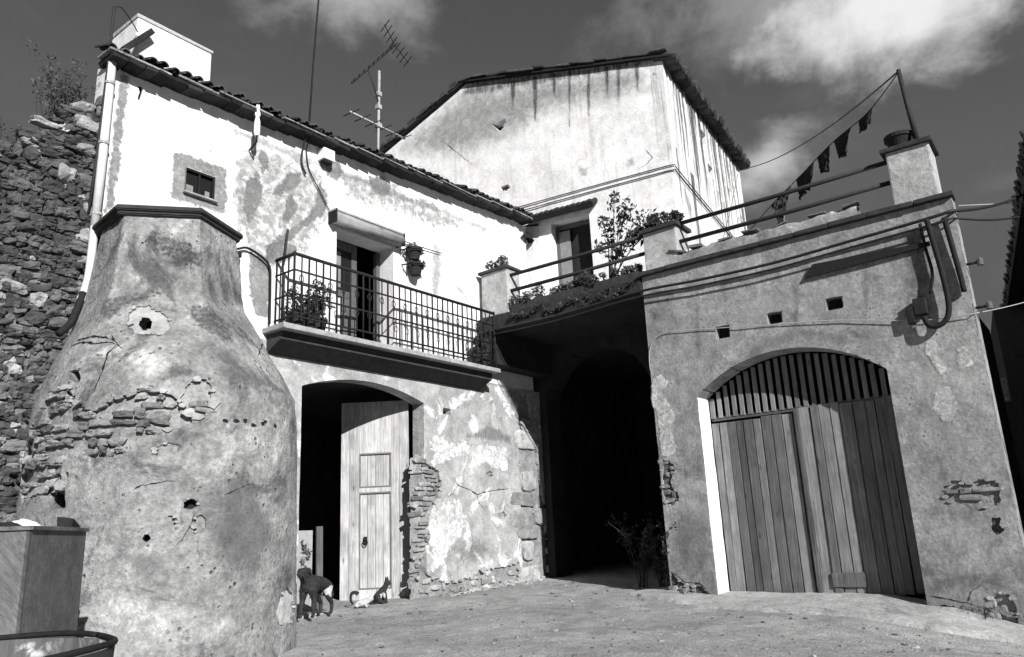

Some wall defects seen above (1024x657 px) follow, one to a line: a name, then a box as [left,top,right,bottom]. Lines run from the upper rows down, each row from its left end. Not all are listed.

water stain [418,62,647,146]
flaking render [127,305,171,335]
crack [72,335,123,391]
flaking render [20,376,277,499]
flaking render [651,374,679,506]
flaking render [407,390,547,600]
flaking render [942,479,1009,535]